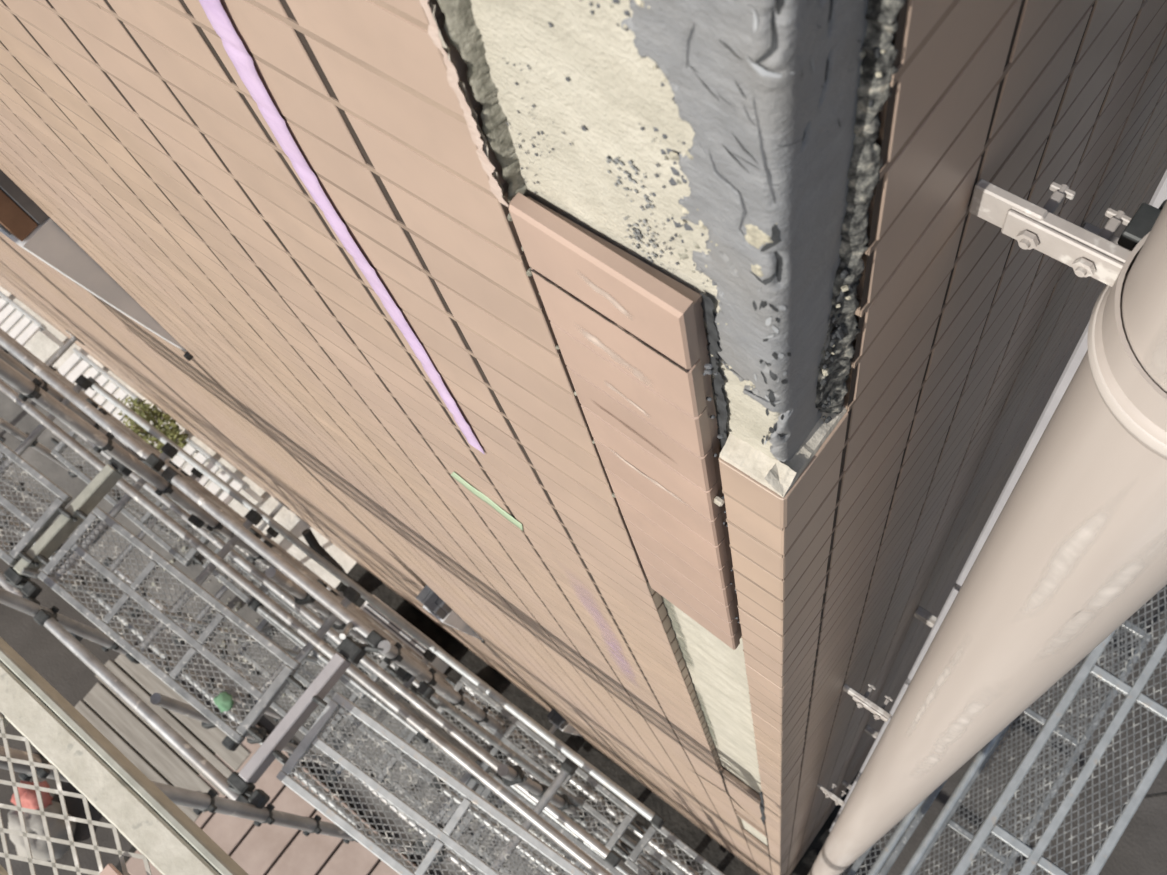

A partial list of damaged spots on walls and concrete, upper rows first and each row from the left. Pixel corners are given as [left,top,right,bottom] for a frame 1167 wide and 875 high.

spalling [419,0,508,207]
spalling [470,0,791,459]
peeling [821,285,853,376]
spalling [662,597,762,793]